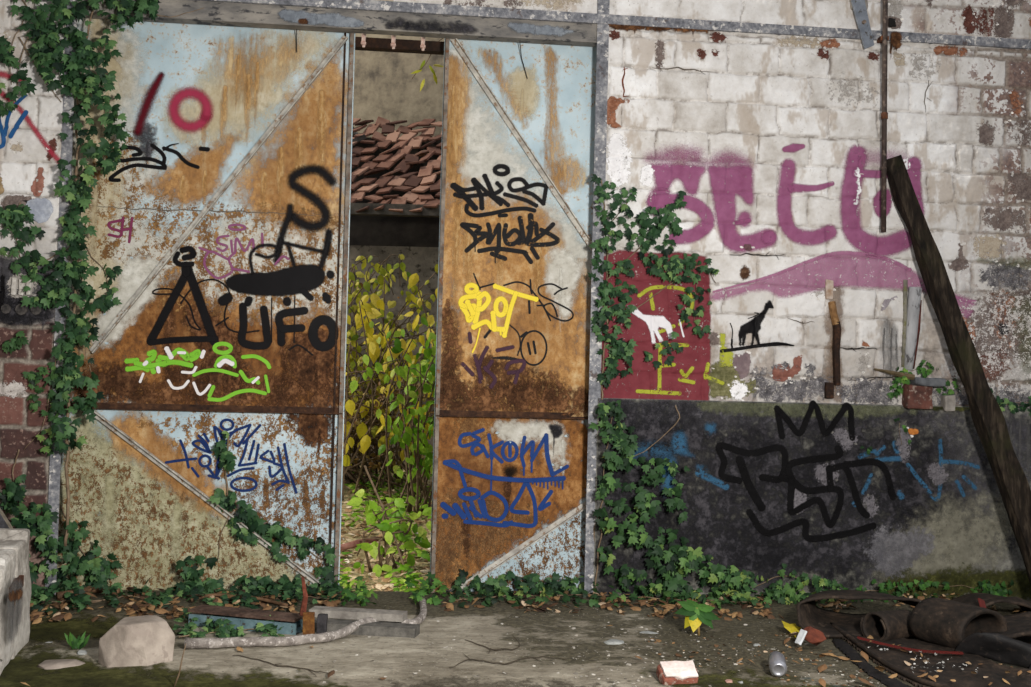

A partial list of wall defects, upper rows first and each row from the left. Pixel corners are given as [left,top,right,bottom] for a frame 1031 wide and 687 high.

peeling [961,0,1031,38]
peeling [976,89,1031,148]
corrosion [58,18,349,590]
corrosion [430,47,591,591]
spalling [948,172,1031,407]
water stain [864,413,1017,582]
water stain [1005,412,1031,483]